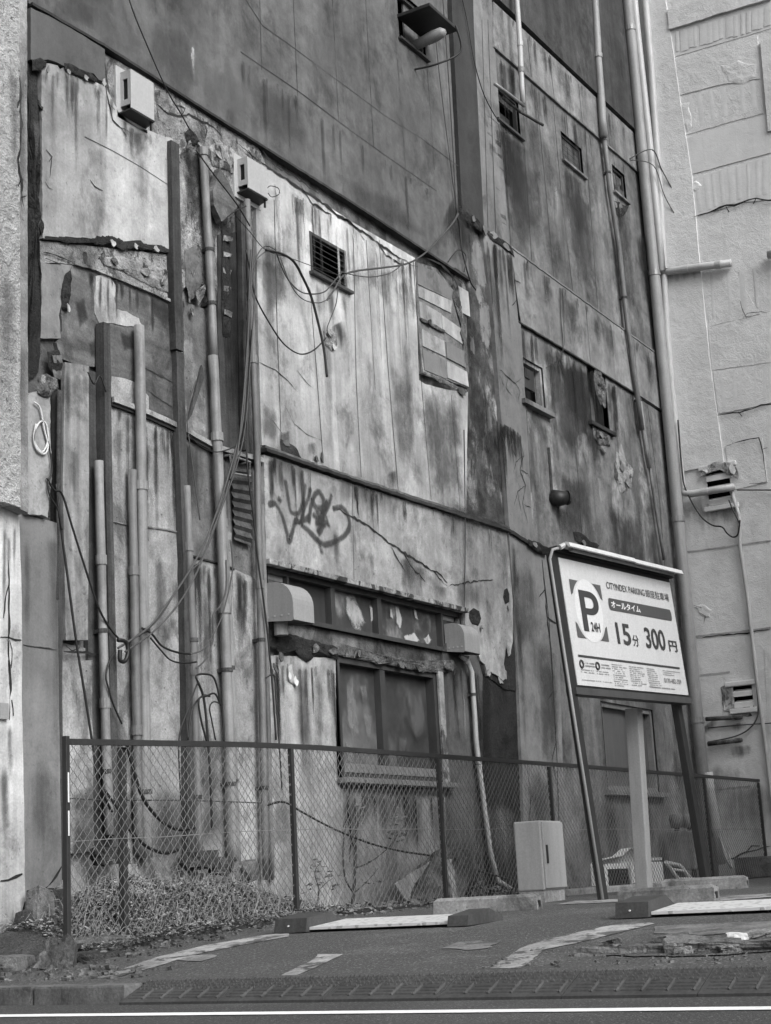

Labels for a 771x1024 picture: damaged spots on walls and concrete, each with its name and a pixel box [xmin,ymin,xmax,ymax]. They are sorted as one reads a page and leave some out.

leakage [53,72,79,126]
leakage [500,63,547,119]
leakage [562,116,651,301]
spalling [43,235,169,293]
leakage [487,244,529,351]
leakage [473,388,523,487]
crack [513,451,531,522]
crack [332,490,492,586]
peeling [346,597,373,629]
peeling [390,606,431,644]
spalling [268,629,457,686]
peeling [480,633,516,691]